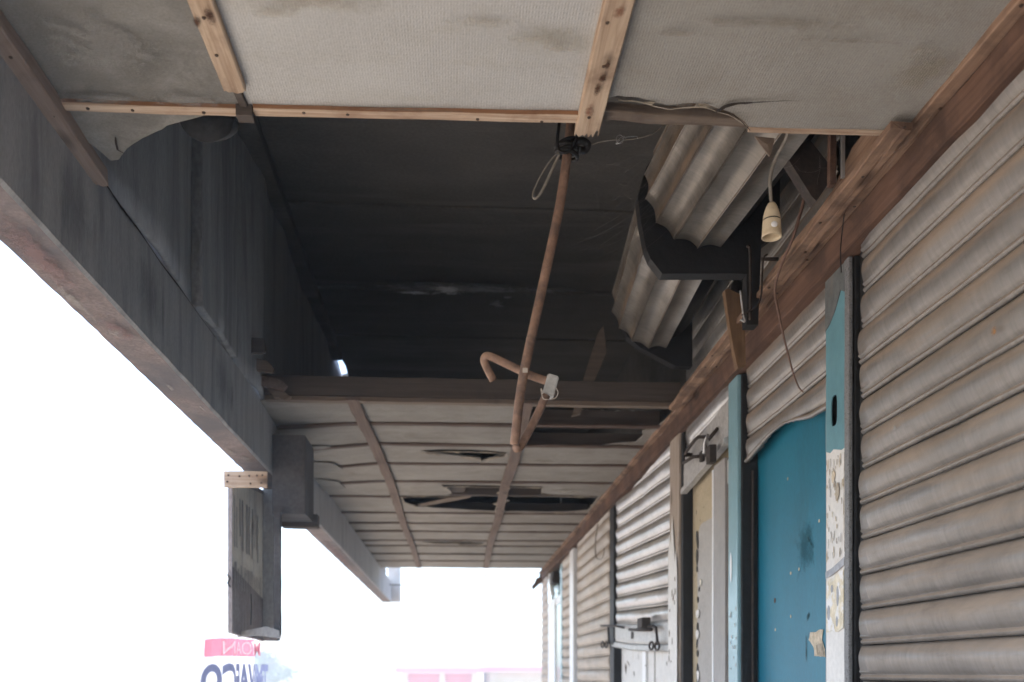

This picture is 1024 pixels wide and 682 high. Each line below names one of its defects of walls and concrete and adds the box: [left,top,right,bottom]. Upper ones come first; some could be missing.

peeling [620,100,775,156]
peeling [818,453,845,563]